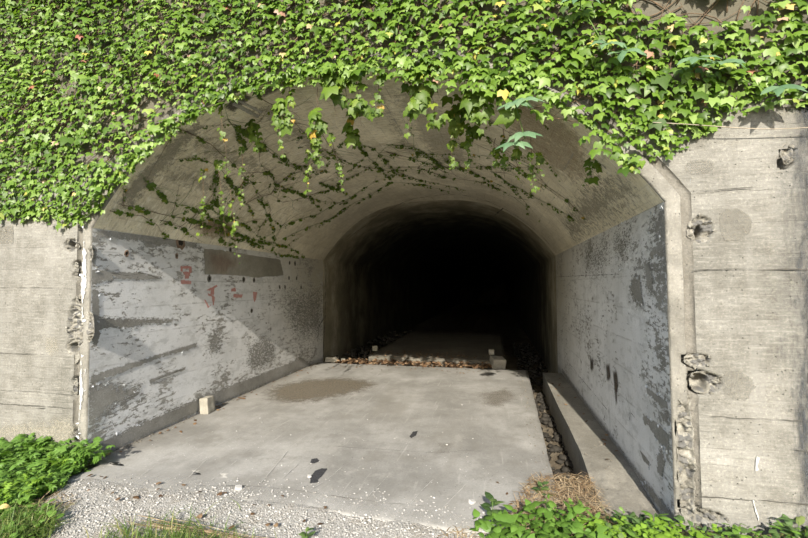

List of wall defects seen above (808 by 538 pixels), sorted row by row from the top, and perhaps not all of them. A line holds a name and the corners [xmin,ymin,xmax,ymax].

spalling [779,144,795,164]
peeling [583,204,665,311]
spalling [686,213,716,244]
peeling [65,230,311,459]
damp [268,378,371,403]
spalling [562,352,730,527]